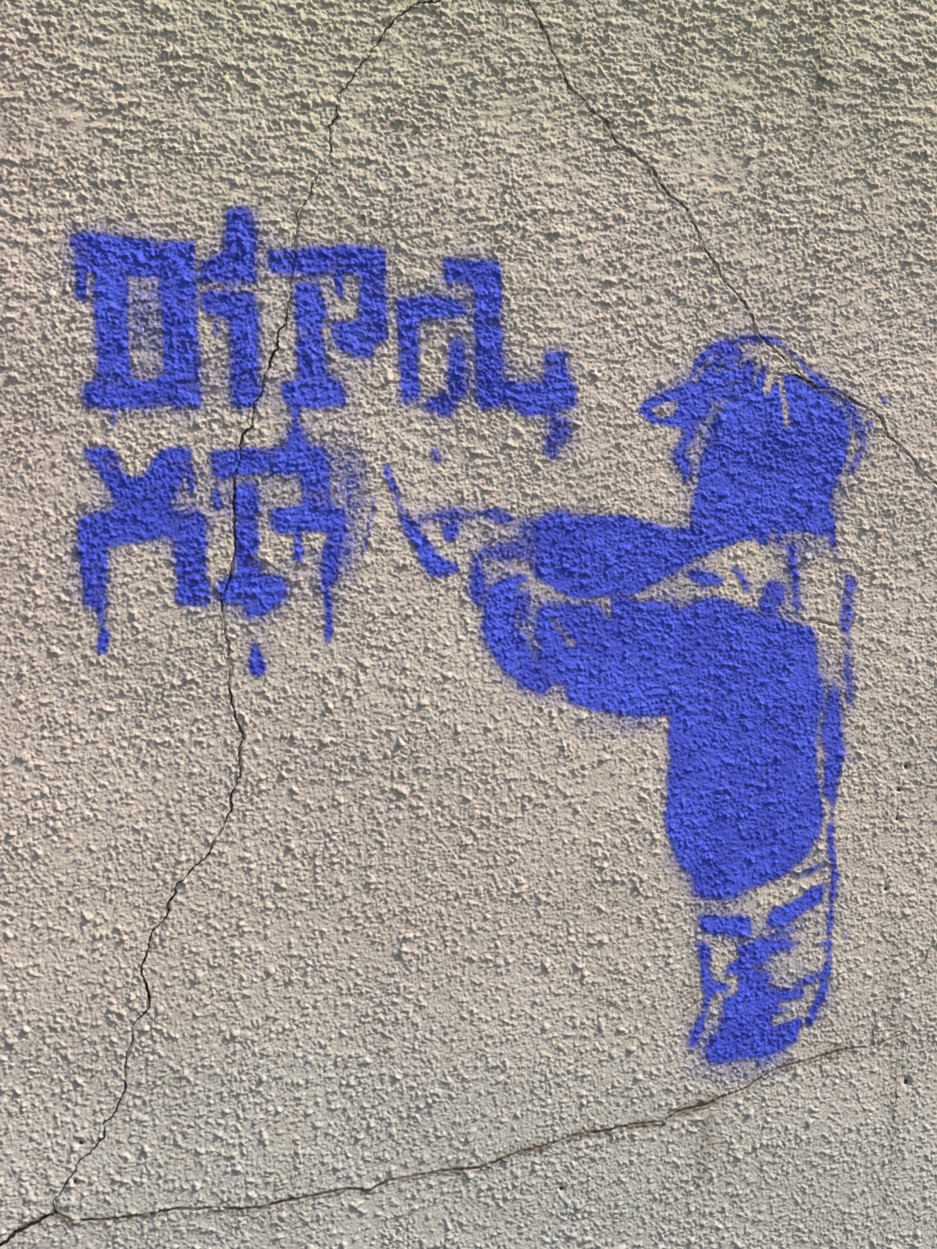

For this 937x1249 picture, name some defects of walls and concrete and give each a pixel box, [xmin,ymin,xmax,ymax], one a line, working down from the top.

crack [220,0,440,612]
crack [528,0,937,485]
crack [0,618,765,1247]
crack [773,1047,854,1072]
crack [881,1032,899,1247]
crack [899,946,937,982]